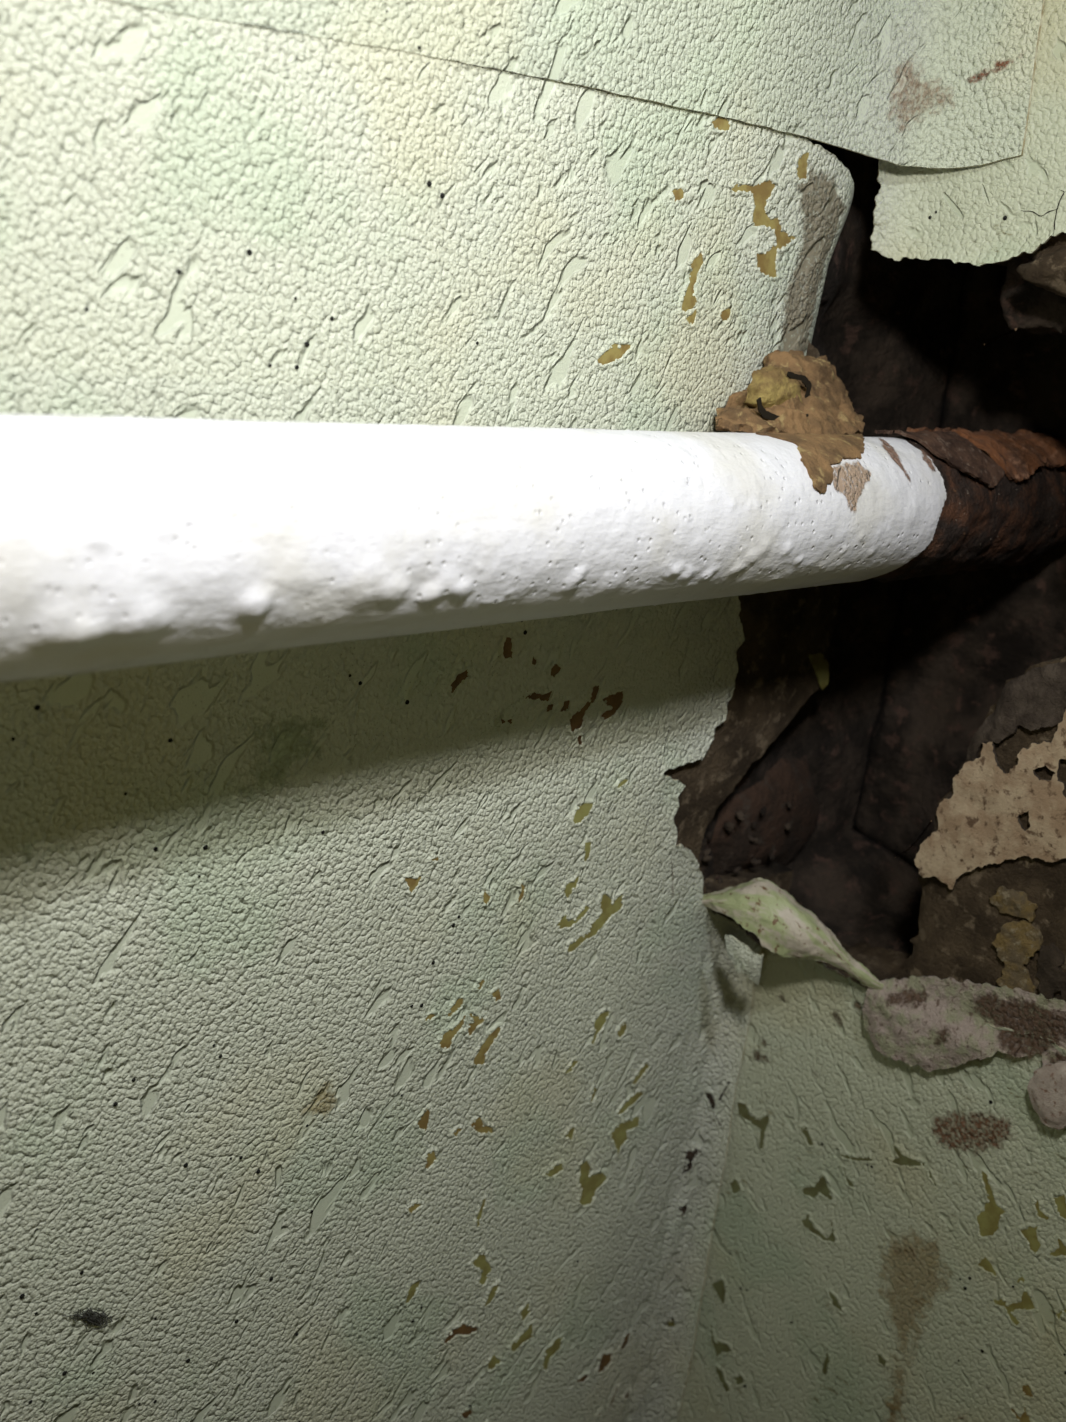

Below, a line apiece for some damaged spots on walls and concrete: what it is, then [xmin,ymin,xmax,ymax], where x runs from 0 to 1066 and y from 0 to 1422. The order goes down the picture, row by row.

crack [242,22,311,35]
peeling [677,247,706,330]
spalling [715,139,1066,494]
rust [833,462,871,511]
rust [879,438,911,482]
spalling [699,543,1066,955]
peeling [554,798,626,956]
peeling [419,975,506,1068]
peeling [862,975,1066,1130]
peeling [541,1059,651,1209]
peeling [798,1141,941,1246]
peeling [973,1166,1066,1330]